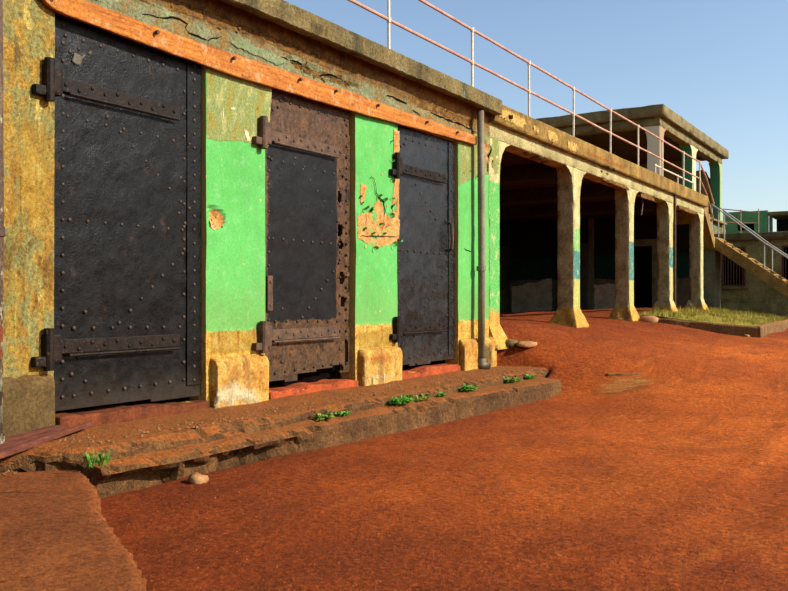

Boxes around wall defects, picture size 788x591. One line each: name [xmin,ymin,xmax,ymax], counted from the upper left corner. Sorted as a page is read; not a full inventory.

crack [145,14,221,40]
crack [282,57,349,86]
peeling [207,67,272,149]
peeling [390,129,400,162]
damp [20,125,43,228]
spalling [209,209,225,230]
peeling [357,173,403,253]